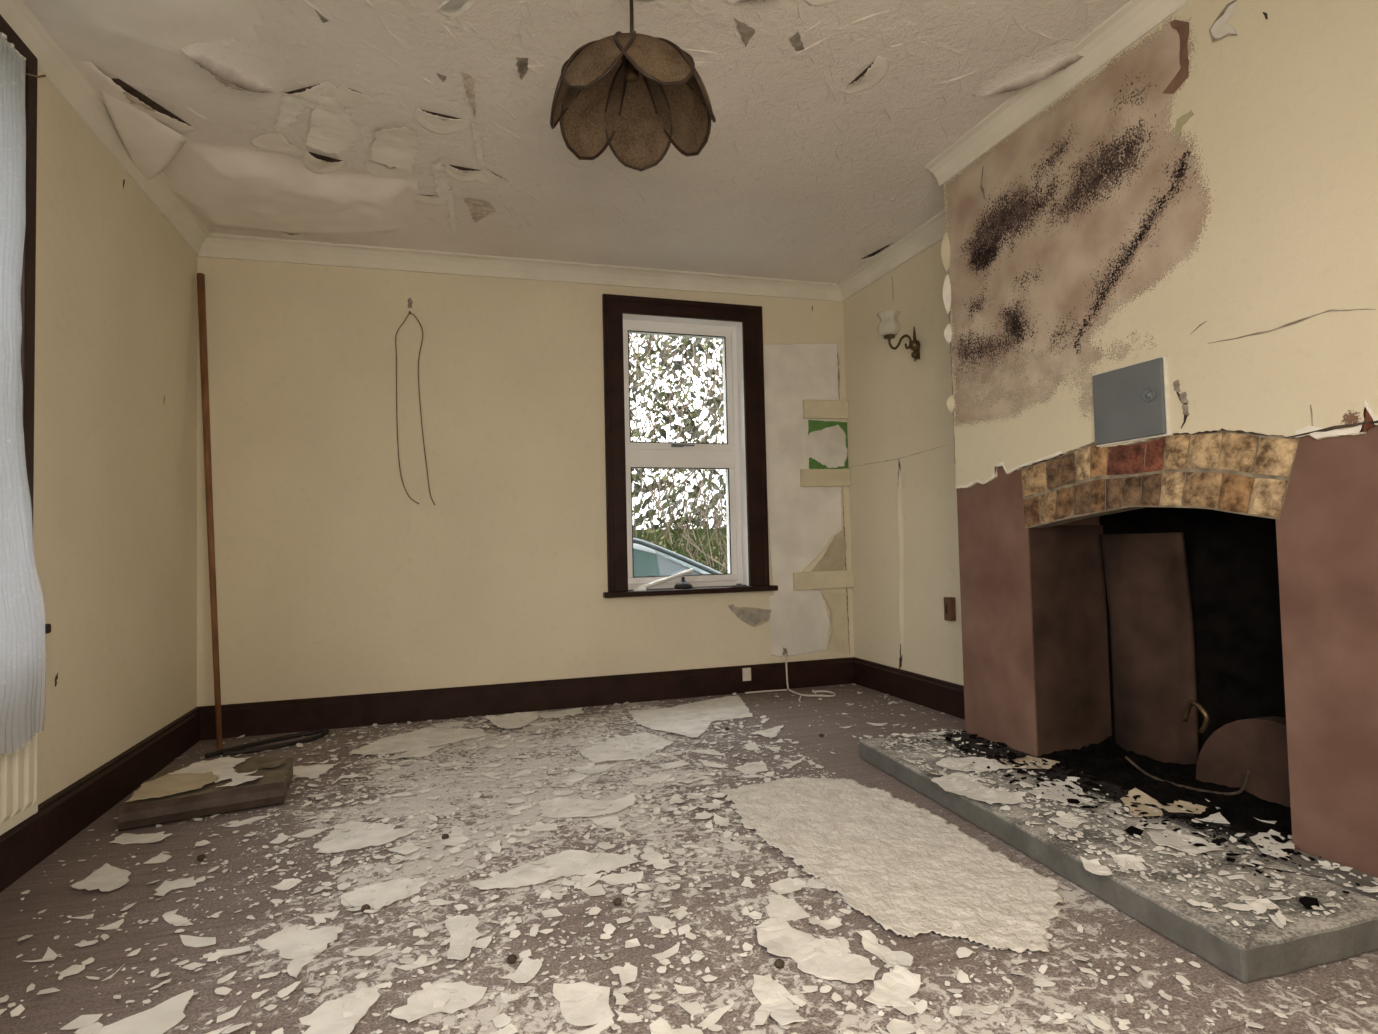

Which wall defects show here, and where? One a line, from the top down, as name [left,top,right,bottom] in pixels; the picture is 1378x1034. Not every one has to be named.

peeling [734,18,755,47]
peeling [789,32,804,51]
peeling [1209,0,1238,42]
peeling [516,57,529,80]
leakage [944,16,1214,426]
flaking render [1286,399,1378,439]
flaking render [763,343,850,657]